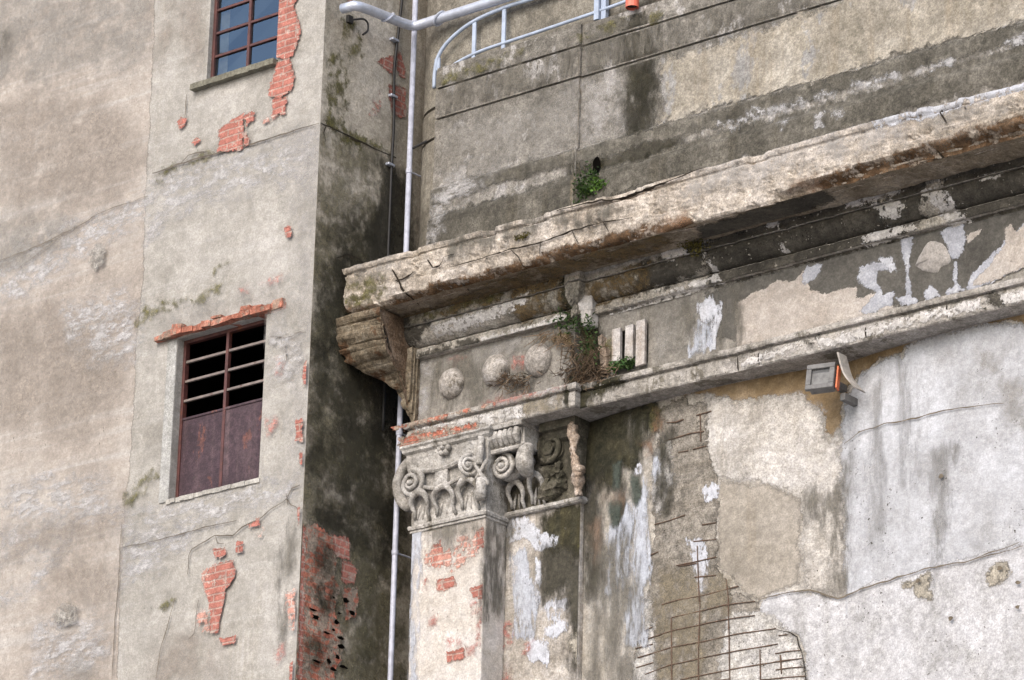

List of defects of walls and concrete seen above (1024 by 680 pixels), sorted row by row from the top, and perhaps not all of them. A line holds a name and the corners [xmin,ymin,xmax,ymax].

flaking render [0,0,316,297]
rust [791,115,1024,194]
crack [392,168,702,305]
damp [302,11,1024,680]
flaking render [736,223,1024,347]
crack [844,403,1003,444]
crack [112,485,300,676]
flaking render [196,540,243,646]
flaking render [276,507,360,680]
flaking render [424,527,484,592]
flaking render [631,314,1024,680]
crack [758,542,1022,600]